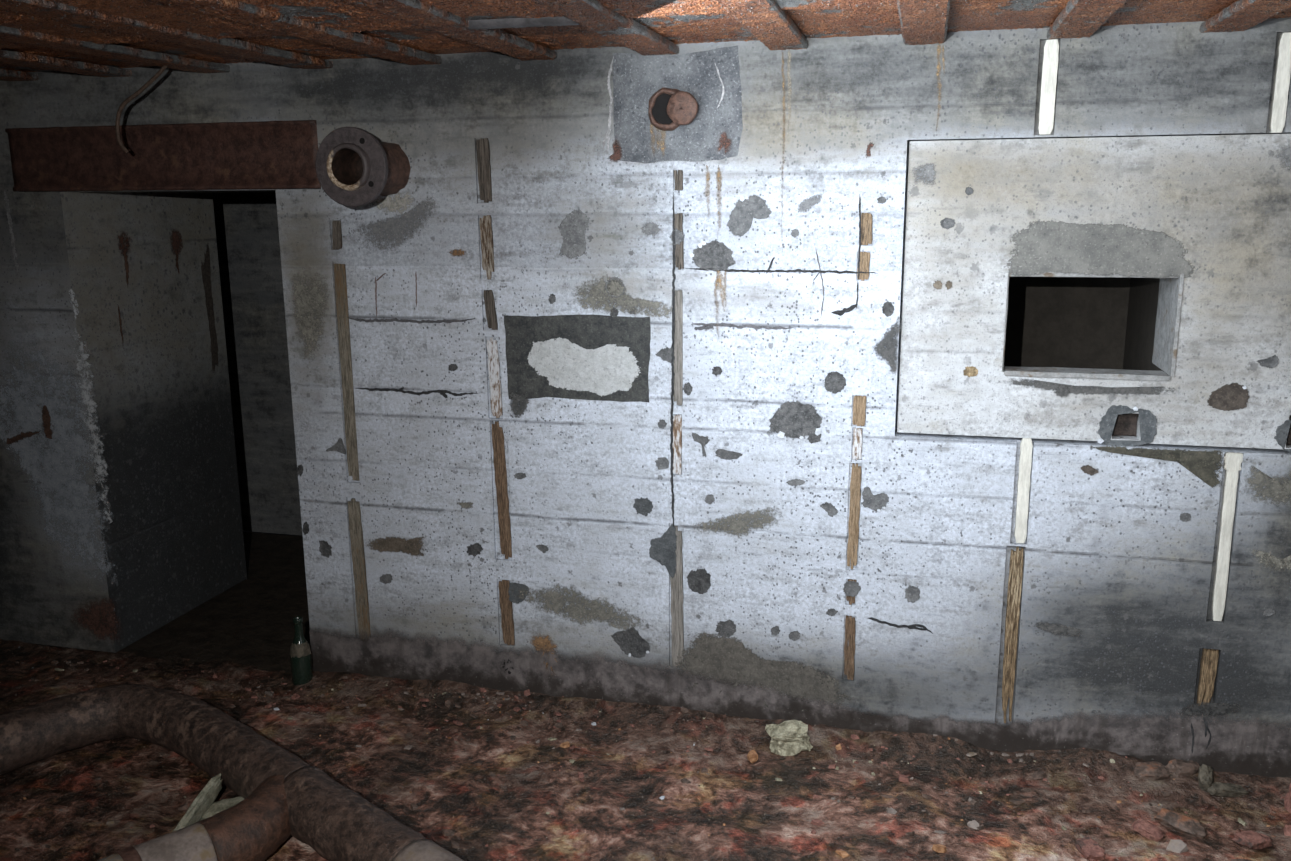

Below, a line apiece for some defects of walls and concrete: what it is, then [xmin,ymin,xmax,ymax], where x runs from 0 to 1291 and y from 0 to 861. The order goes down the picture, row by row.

peeling [558,209,589,259]
spalling [642,195,771,271]
corrosion [118,232,130,286]
crack [356,387,478,398]
spalling [769,400,822,444]
spalling [1097,405,1157,447]
crack [868,617,933,634]
damp [1036,622,1080,636]
damp [309,629,1291,778]